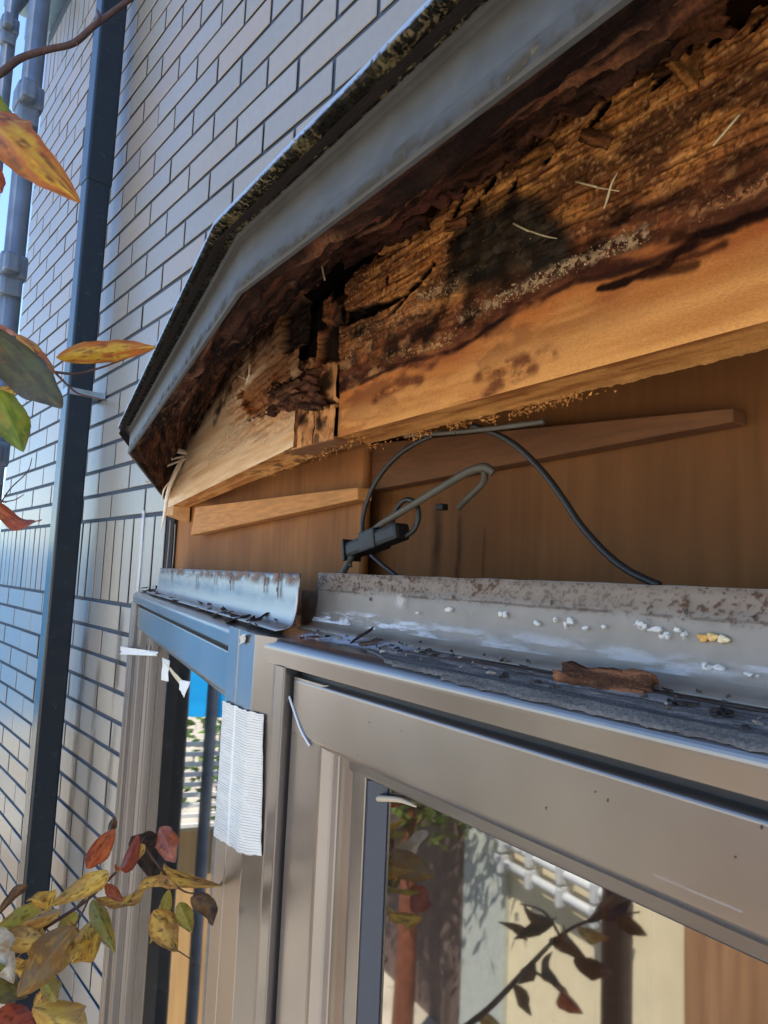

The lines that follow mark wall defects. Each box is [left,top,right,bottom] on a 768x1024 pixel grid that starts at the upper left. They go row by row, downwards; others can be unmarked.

peeling [578,127,613,151]
peeling [378,237,410,255]
damp [320,172,768,397]
damp [298,414,323,430]
corrosion [161,569,299,598]
peeling [350,627,382,646]
peeling [635,620,687,640]